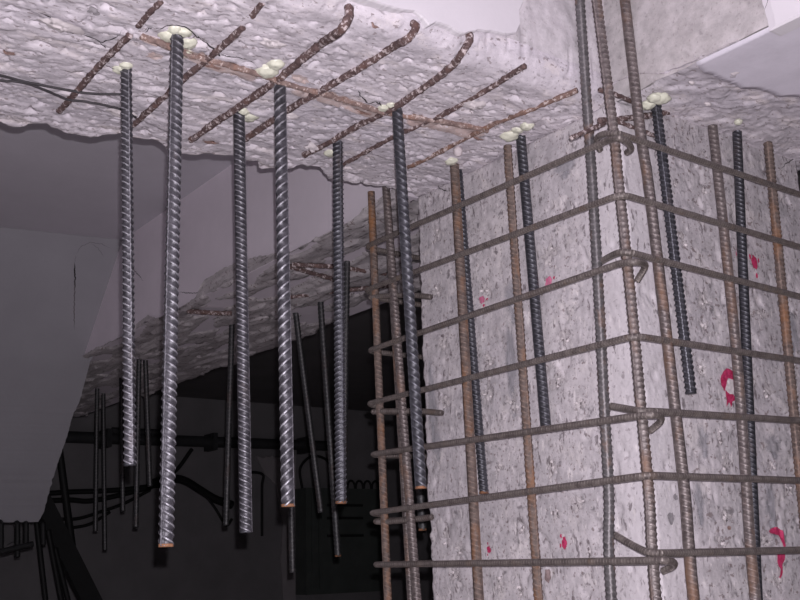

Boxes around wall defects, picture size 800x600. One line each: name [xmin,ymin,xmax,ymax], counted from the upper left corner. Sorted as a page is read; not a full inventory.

rust [56,0,171,114]
rust [132,88,170,128]
rust [183,2,579,169]
crack [73,242,109,330]
spalling [0,0,604,600]